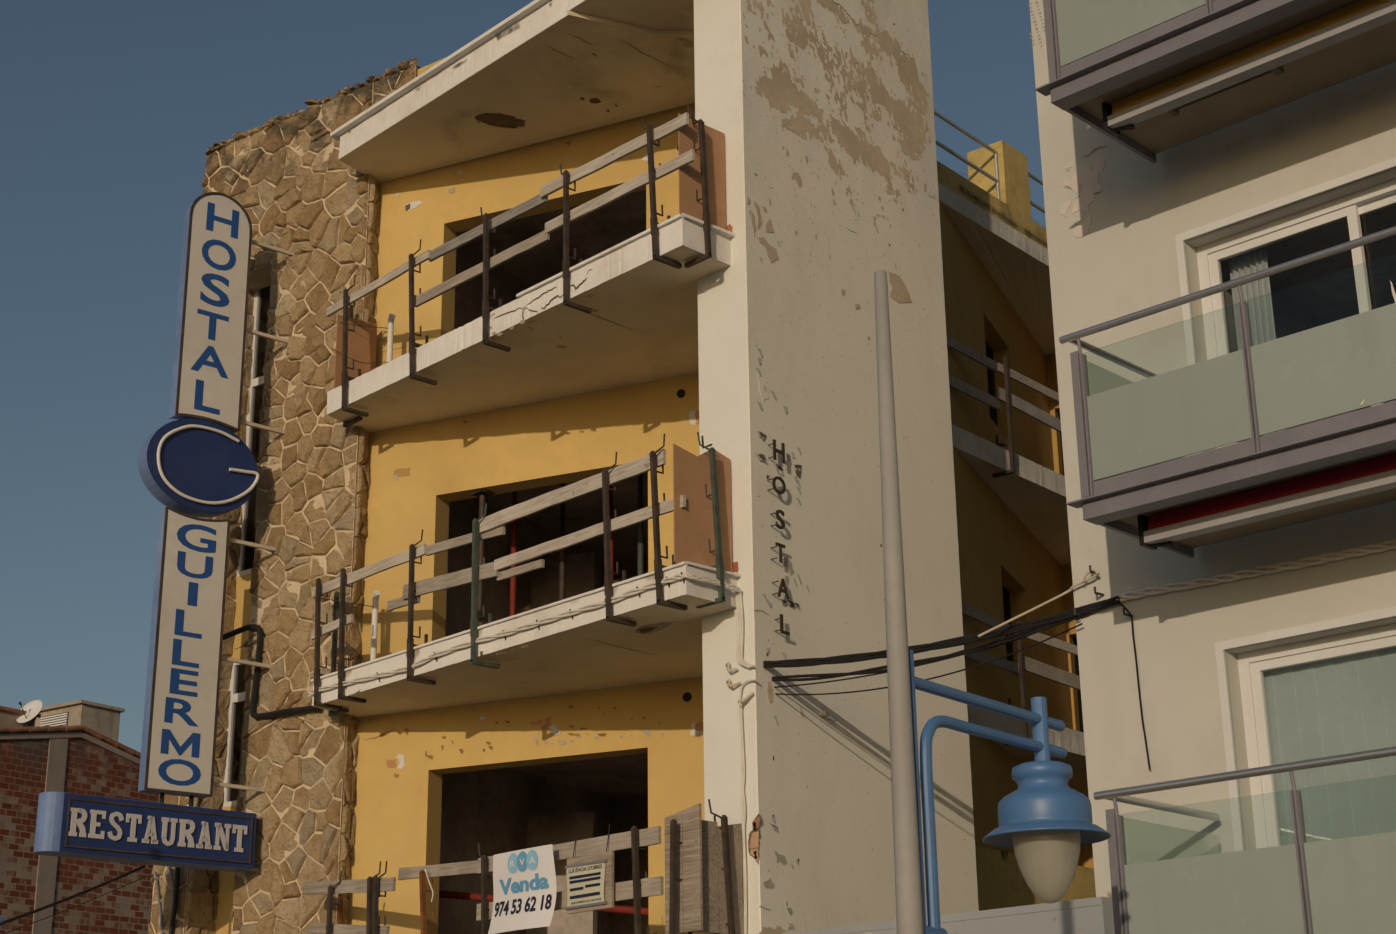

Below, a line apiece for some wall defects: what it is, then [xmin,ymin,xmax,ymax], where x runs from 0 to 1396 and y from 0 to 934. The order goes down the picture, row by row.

spalling [475,113,526,130]
peeling [743,0,935,317]
peeling [1060,146,1106,238]